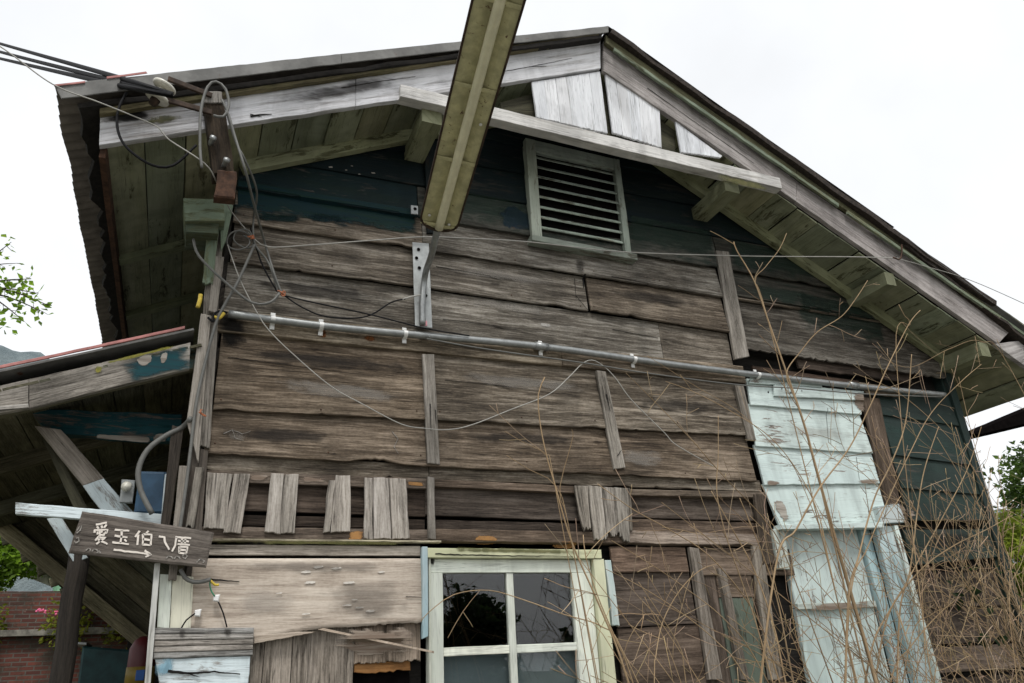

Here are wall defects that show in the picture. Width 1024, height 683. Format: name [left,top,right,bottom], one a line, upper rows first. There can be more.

peeling [124,348,189,380]
peeling [774,501,789,521]